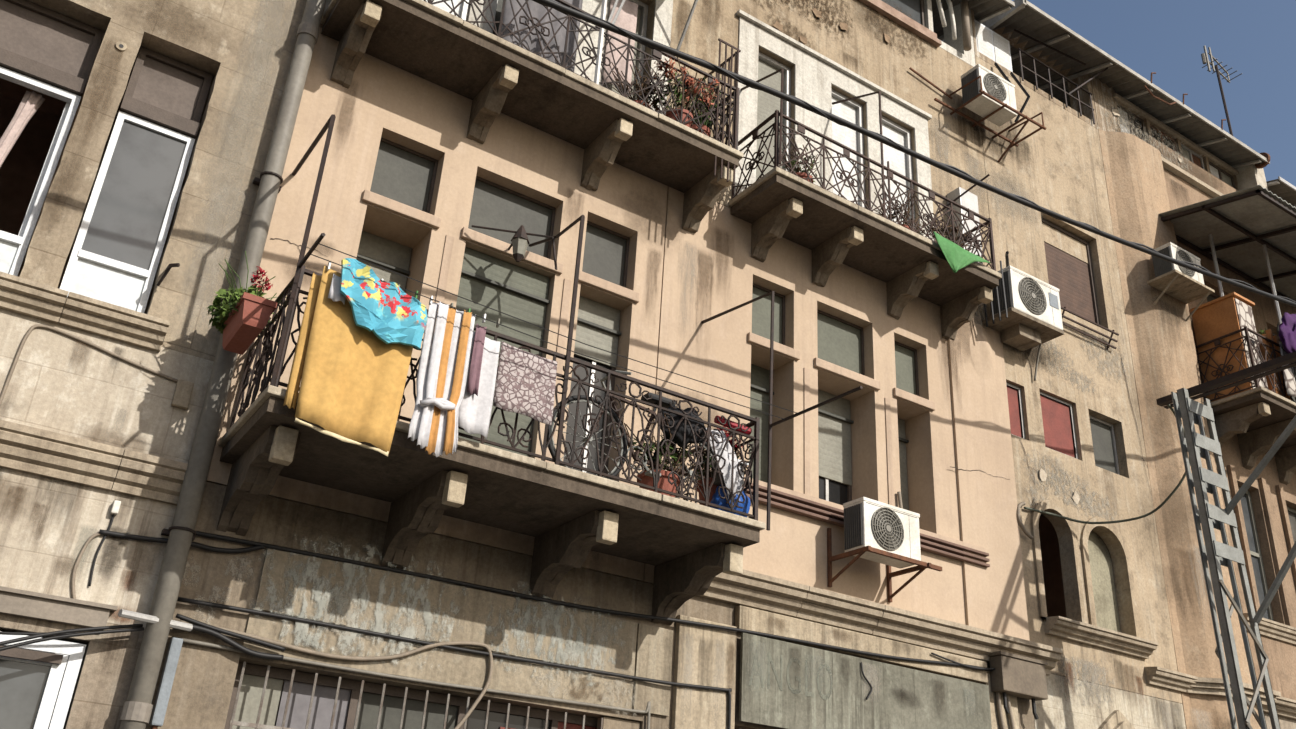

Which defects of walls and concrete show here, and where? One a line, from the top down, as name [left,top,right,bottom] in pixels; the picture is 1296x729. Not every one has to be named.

spalling [767,0,925,55]
peeling [258,539,459,664]
peeling [486,584,635,706]